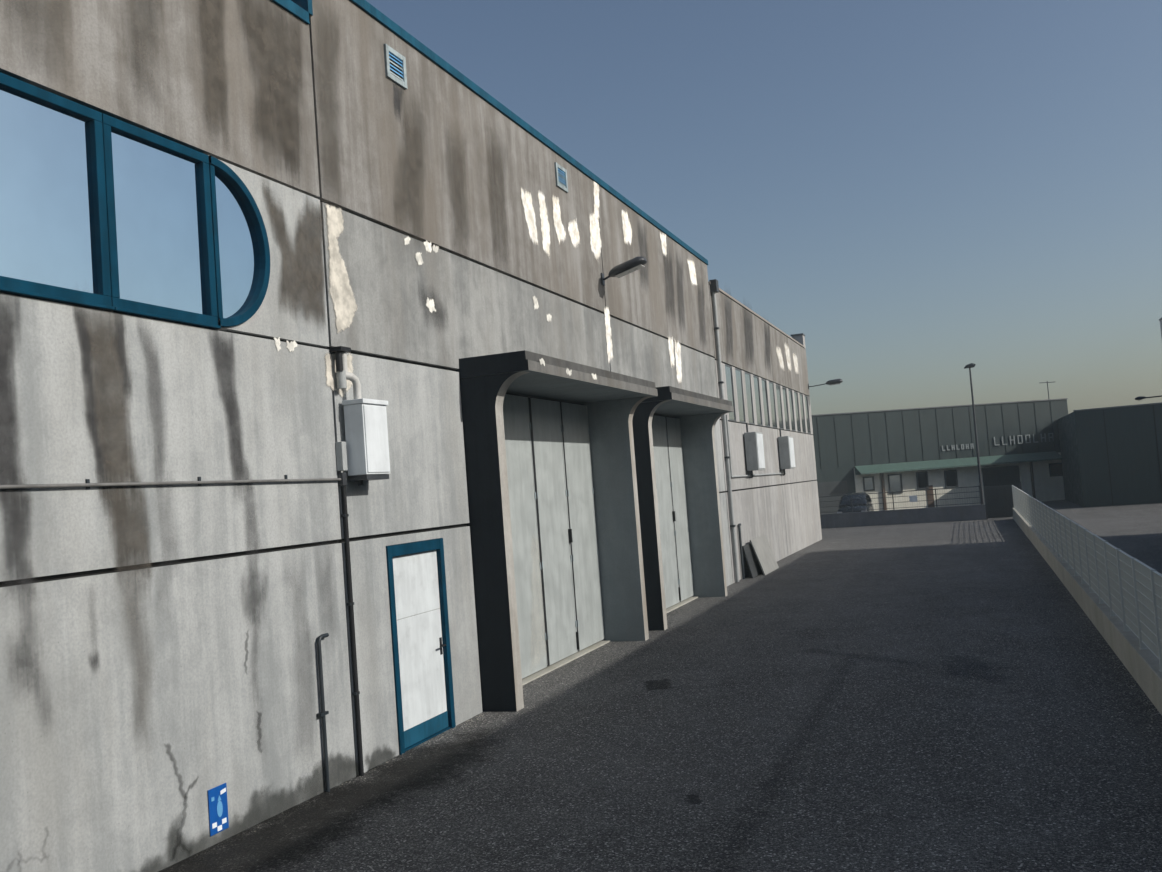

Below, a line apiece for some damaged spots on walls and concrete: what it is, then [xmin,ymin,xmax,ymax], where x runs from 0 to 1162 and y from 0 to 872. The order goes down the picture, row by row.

damp [200,0,226,130]
damp [241,0,301,165]
damp [394,85,402,113]
damp [400,126,422,220]
damp [264,190,324,319]
peeling [326,205,357,332]
peeling [404,236,439,265]
damp [0,305,28,572]
damp [77,316,149,572]
damp [213,334,247,480]
peeling [325,353,353,397]